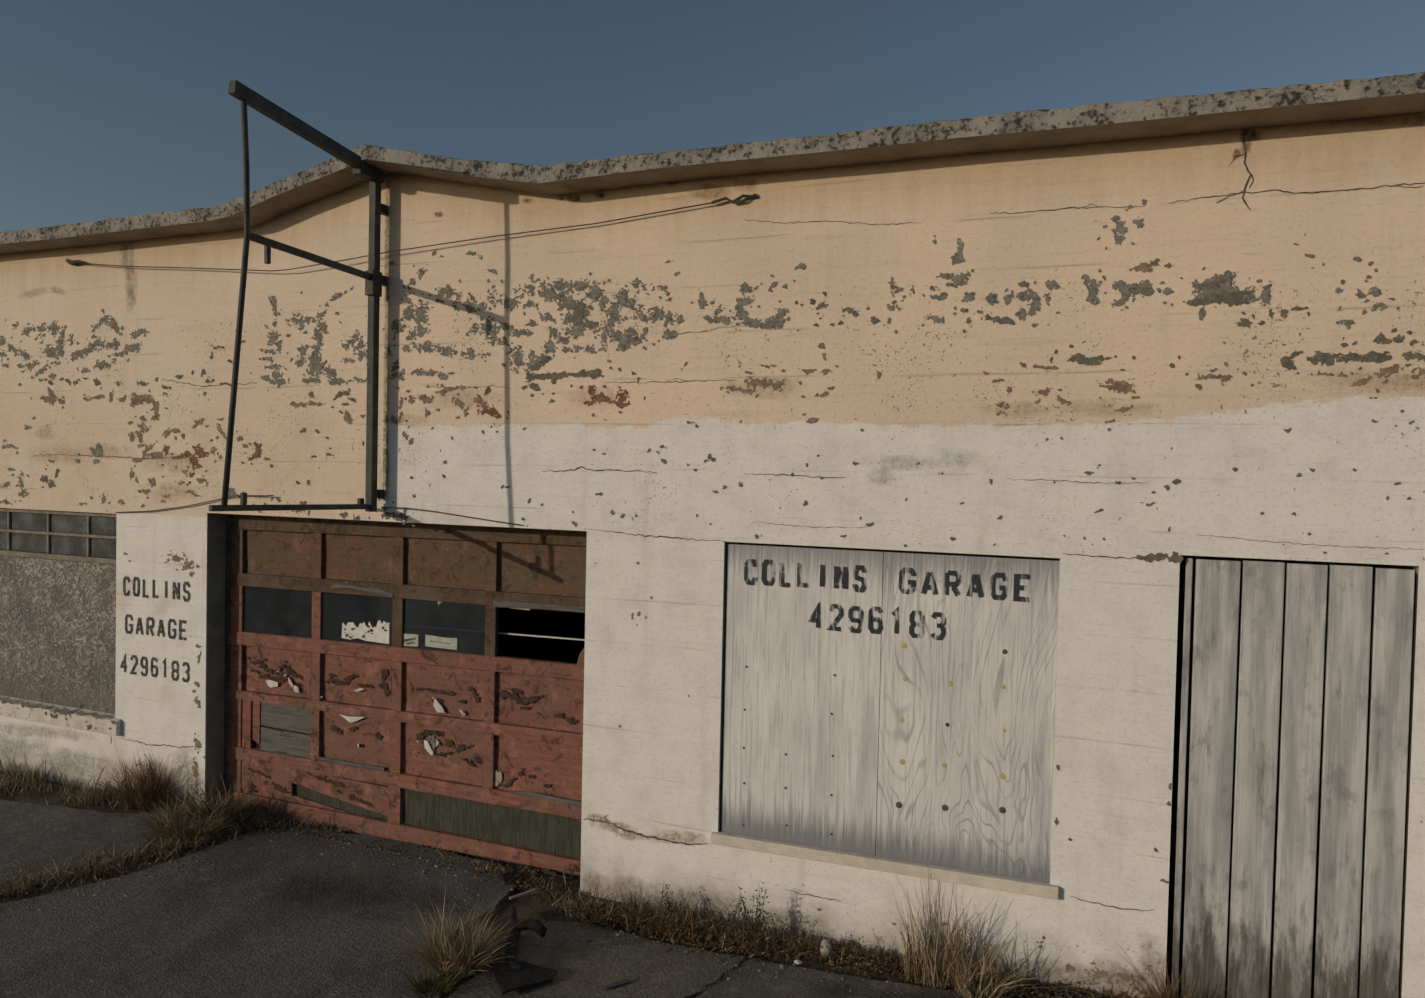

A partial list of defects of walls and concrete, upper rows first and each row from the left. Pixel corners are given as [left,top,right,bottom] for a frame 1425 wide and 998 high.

crack [990,129,1425,214]
peeling [1097,199,1147,249]
spalling [1081,258,1310,327]
peeling [0,308,273,511]
peeling [250,238,1060,445]
peeling [1019,344,1140,431]
peeling [1170,355,1254,390]
spalling [1280,256,1425,399]
peeling [339,476,416,527]
crack [583,814,707,845]
crack [686,957,748,998]